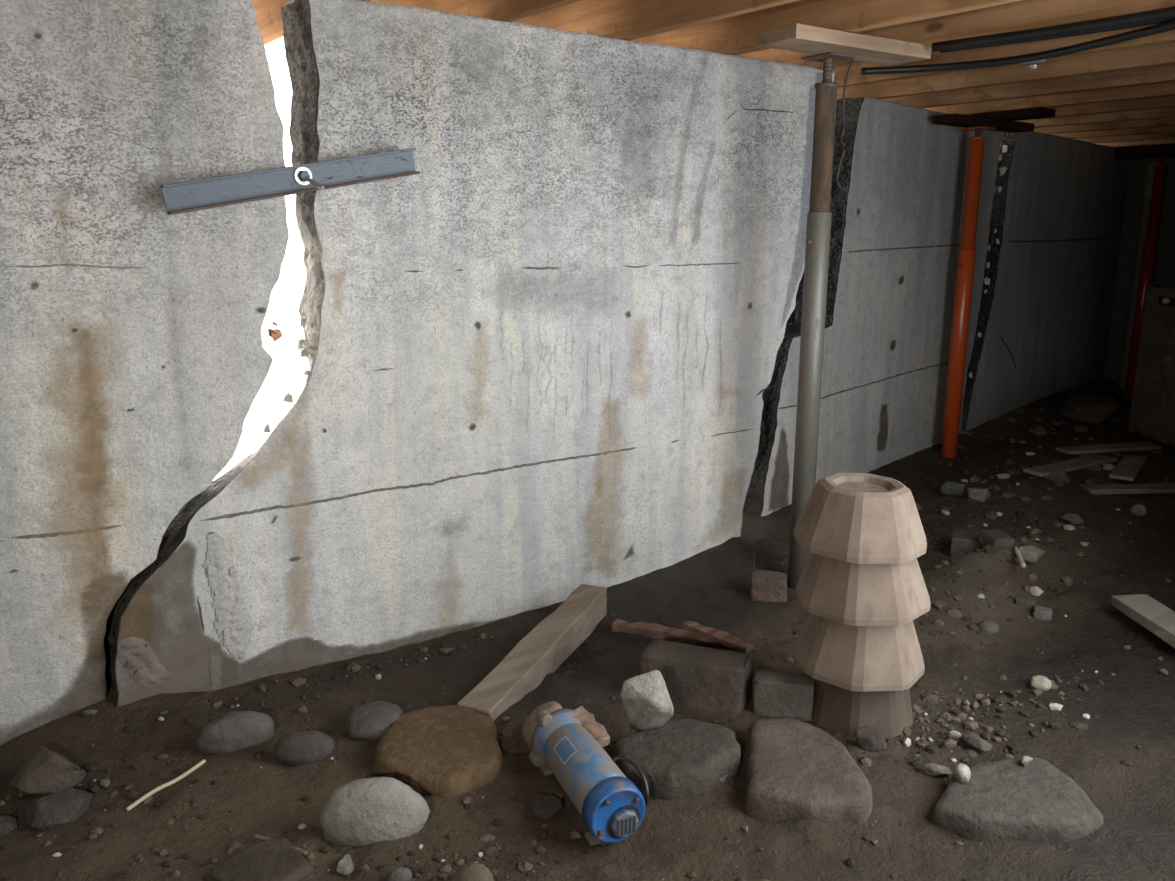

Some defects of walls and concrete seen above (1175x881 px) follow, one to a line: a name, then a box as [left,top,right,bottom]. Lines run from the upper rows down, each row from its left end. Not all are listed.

crack [10,262,148,270]
corrosion [78,335,105,492]
crack [104,0,638,702]
crack [622,261,738,269]
crack [711,97,1122,516]
crack [0,525,122,542]